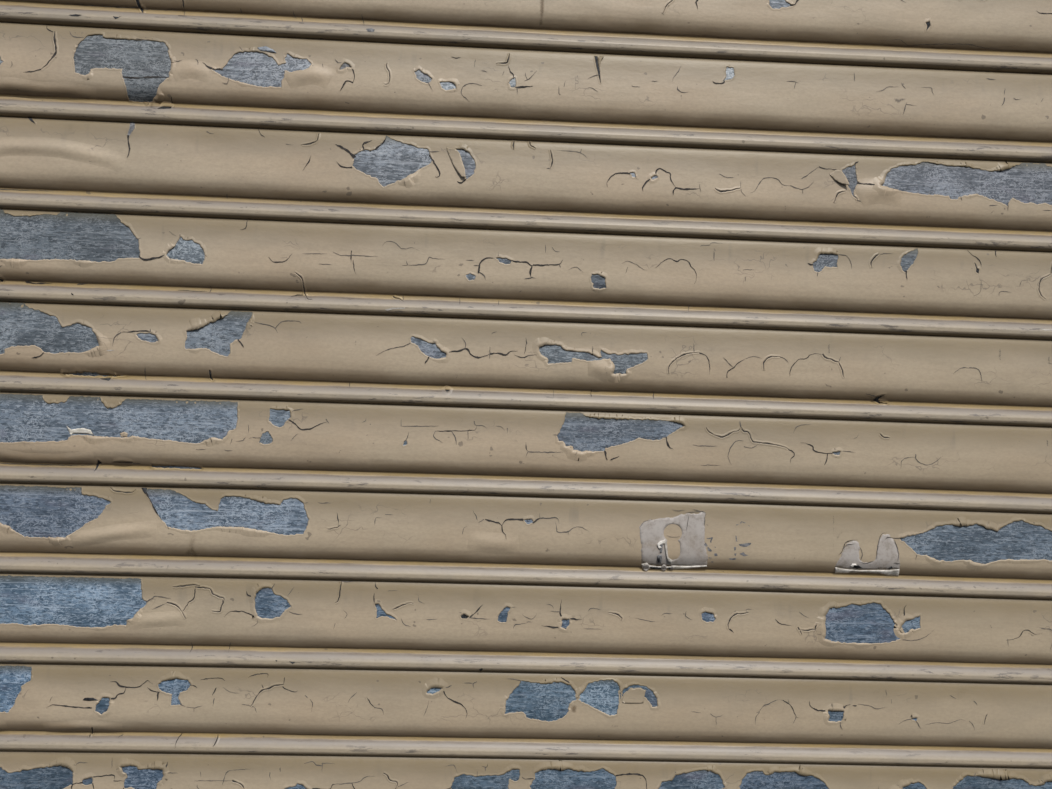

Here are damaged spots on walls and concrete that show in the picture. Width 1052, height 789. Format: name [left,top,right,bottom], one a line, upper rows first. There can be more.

peeling [71,30,181,109]
peeling [830,160,1052,208]
peeling [0,209,207,269]
peeling [0,301,163,379]
crack [653,348,846,399]
peeling [0,393,240,447]
crack [696,423,810,466]
peeling [0,485,113,546]
peeling [142,488,312,537]
peeling [887,517,1052,571]
peeling [0,575,166,631]
peeling [448,760,831,789]